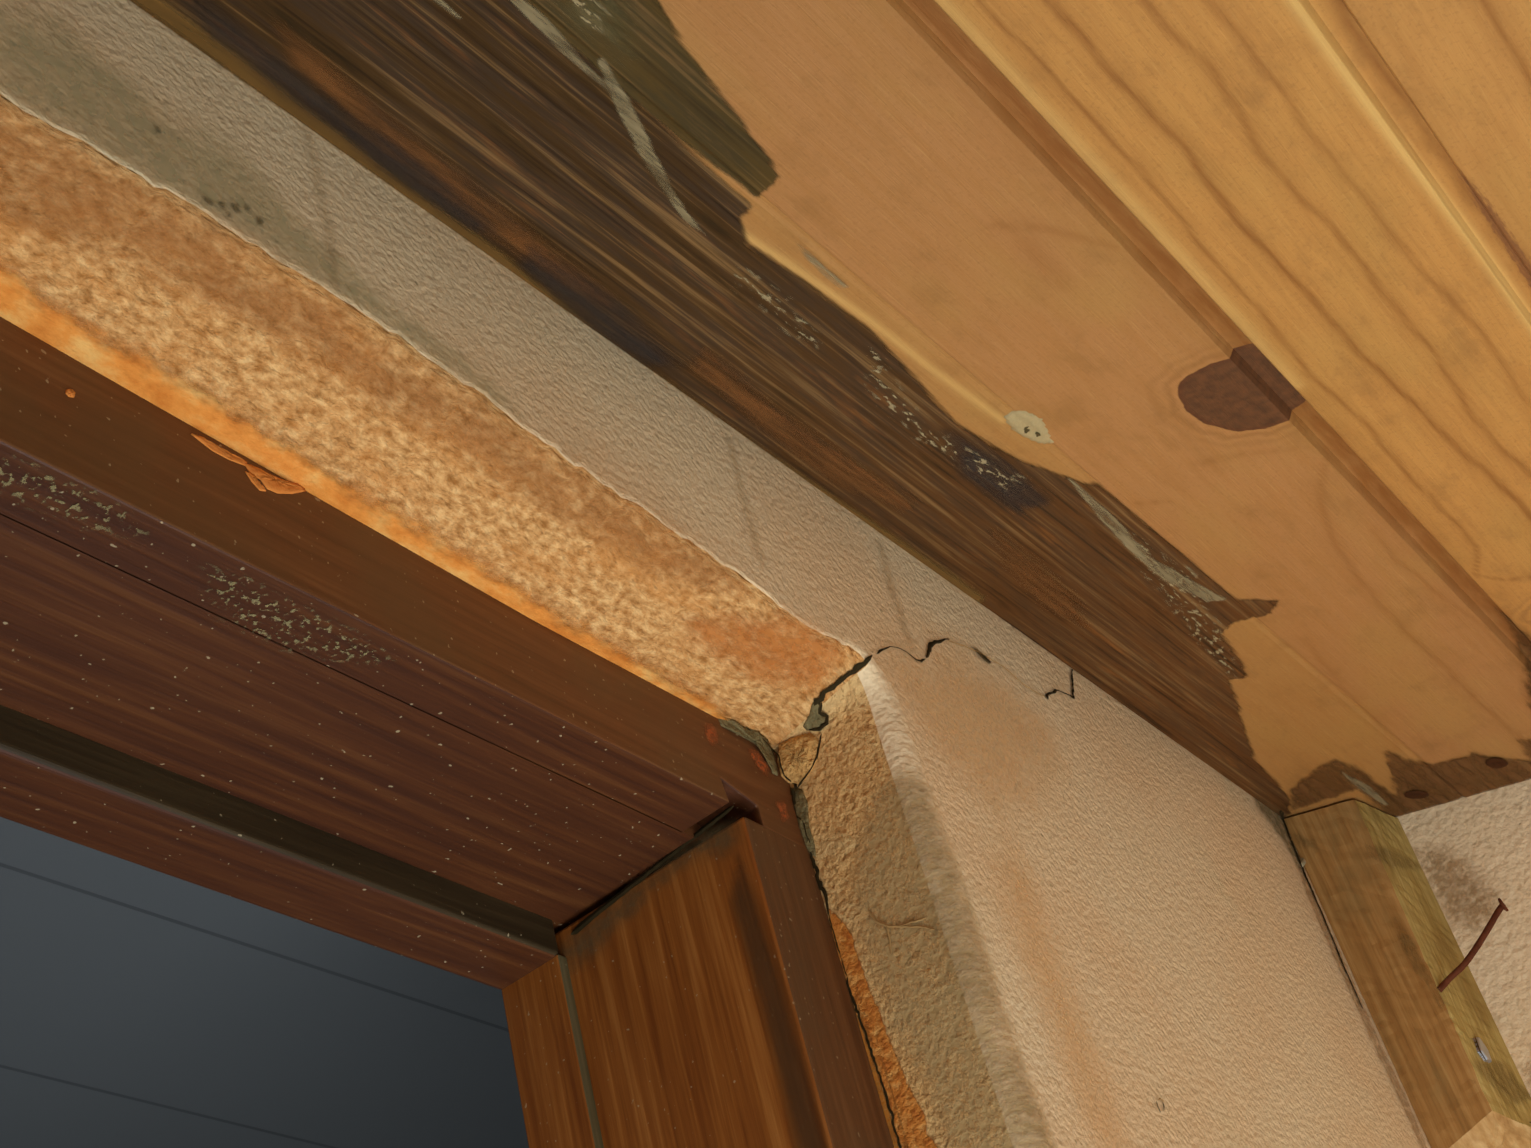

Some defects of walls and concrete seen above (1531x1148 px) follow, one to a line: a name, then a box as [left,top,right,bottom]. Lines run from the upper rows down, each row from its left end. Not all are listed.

water stain [130,0,1531,817]
water stain [0,463,125,529]
crack [814,638,1075,707]